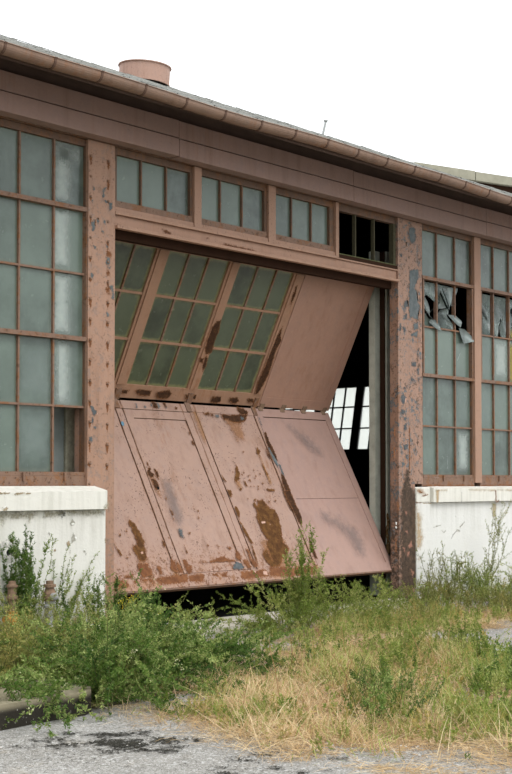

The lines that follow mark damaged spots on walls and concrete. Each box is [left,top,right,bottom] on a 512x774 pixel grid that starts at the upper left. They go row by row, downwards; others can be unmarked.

peeling [105,245,114,299]
peeling [400,269,420,338]
corrosion [199,320,221,372]
corrosion [122,387,172,399]
corrosion [194,328,282,440]
corrosion [114,432,318,592]